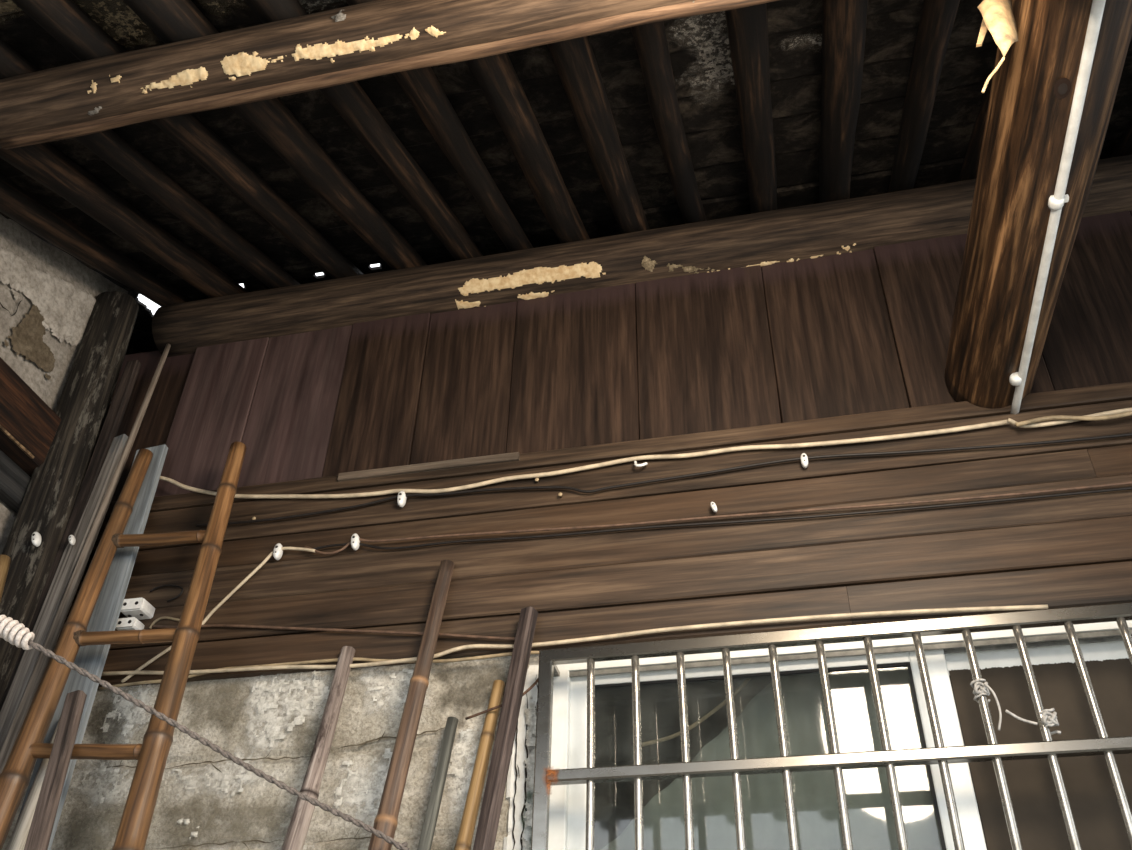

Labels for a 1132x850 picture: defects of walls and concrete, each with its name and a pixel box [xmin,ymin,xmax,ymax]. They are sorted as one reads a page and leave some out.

peeling [220,26,446,81]
peeling [141,67,208,94]
peeling [455,262,606,310]
peeling [641,256,730,274]
peeling [747,255,823,267]
peeling [0,247,96,380]
crack [512,674,538,850]